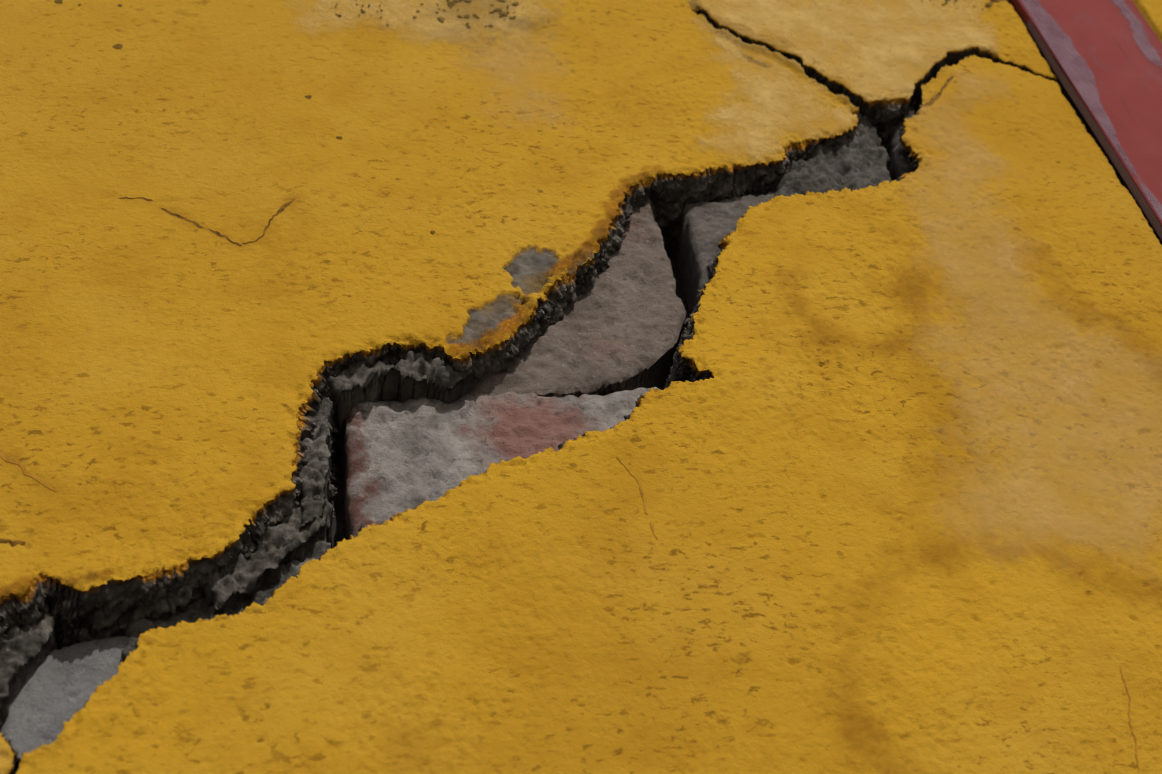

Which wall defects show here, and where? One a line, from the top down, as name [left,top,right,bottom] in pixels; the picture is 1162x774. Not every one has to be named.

crack [689,0,868,117]
crack [907,47,1057,114]
crack [121,197,296,246]
flaking render [0,0,993,655]
crack [616,456,658,540]
crack [8,756,20,774]
flaking render [0,721,34,772]